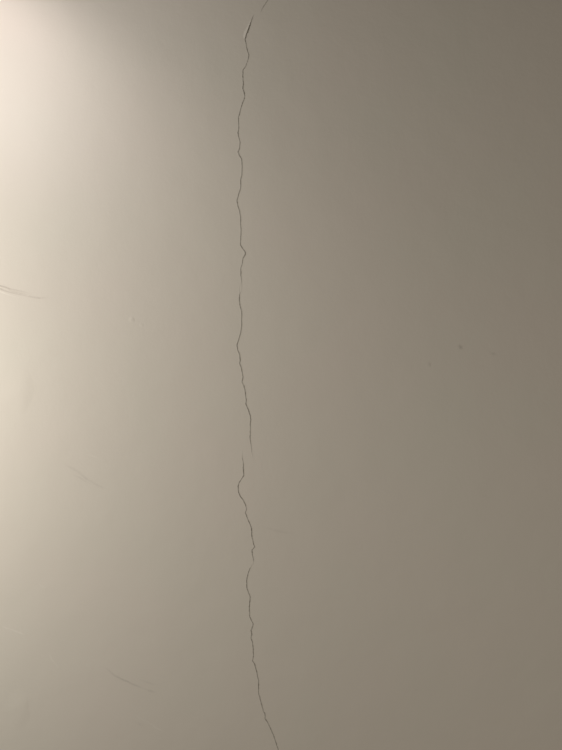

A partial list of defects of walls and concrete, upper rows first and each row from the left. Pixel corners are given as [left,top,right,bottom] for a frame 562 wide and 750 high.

crack [236,0,279,750]